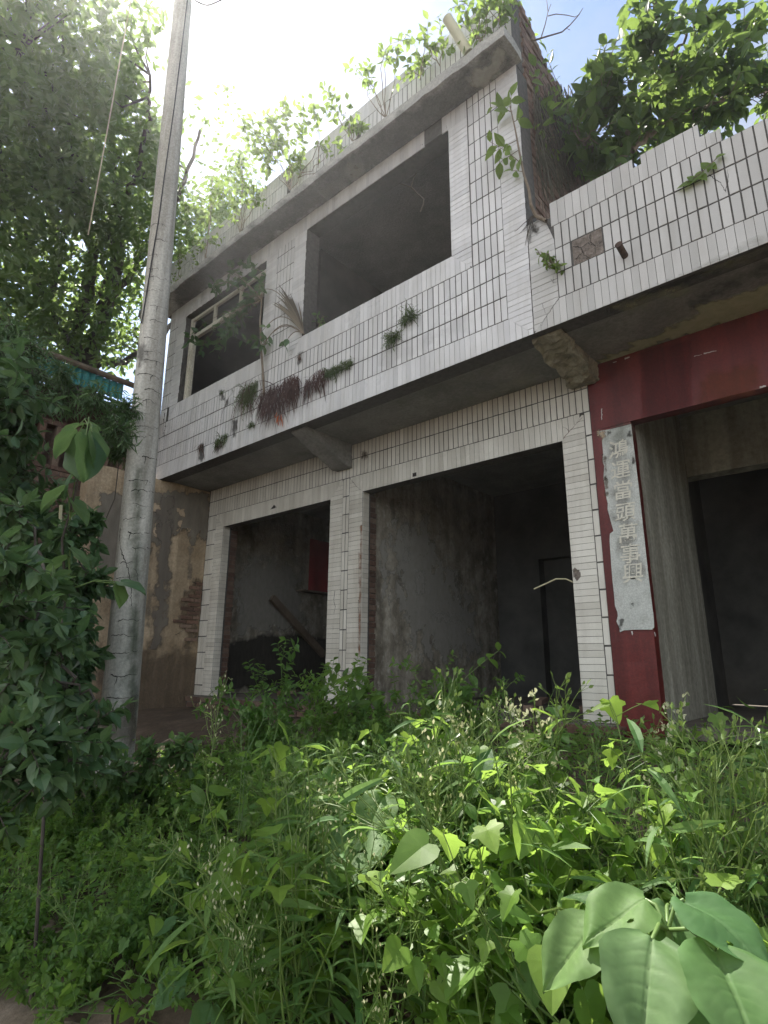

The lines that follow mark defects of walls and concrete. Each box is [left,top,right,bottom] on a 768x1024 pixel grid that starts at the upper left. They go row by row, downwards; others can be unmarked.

crack [107,223,166,699]
peeling [97,491,122,569]
peeling [150,490,210,554]
flaking render [173,578,203,647]